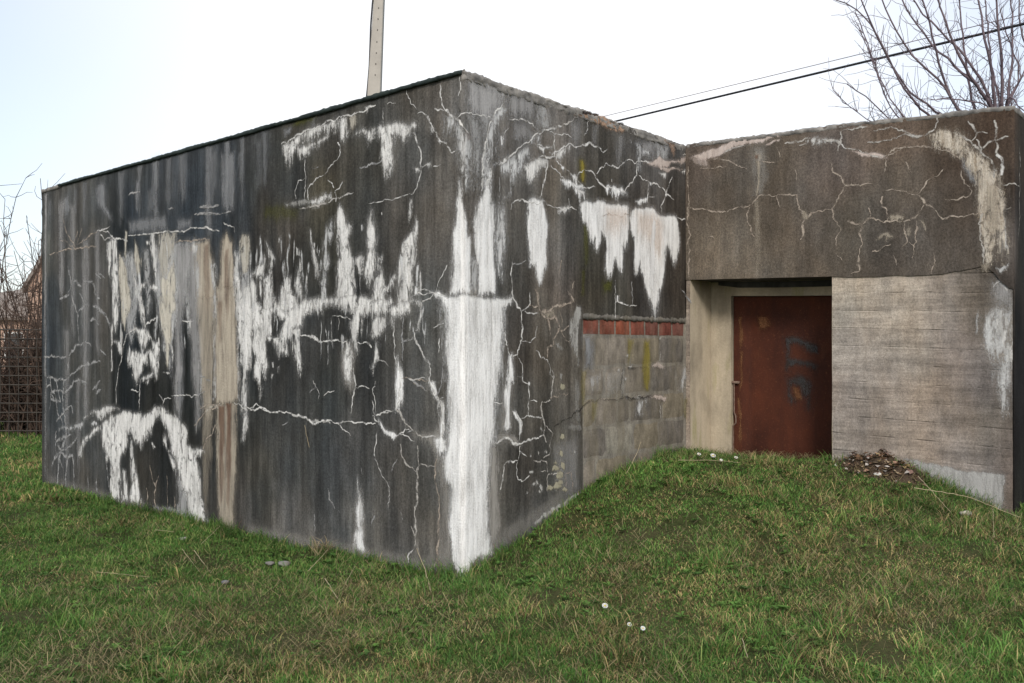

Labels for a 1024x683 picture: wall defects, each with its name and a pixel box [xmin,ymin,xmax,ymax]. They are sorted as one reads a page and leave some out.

leakage [60,197,69,293]
crack [45,204,235,490]
crack [194,315,447,572]
leakage [66,82,604,578]
crack [494,260,661,490]
leakage [580,200,685,317]
crack [295,77,982,303]
leakage [930,129,1013,408]
crack [968,120,1020,237]